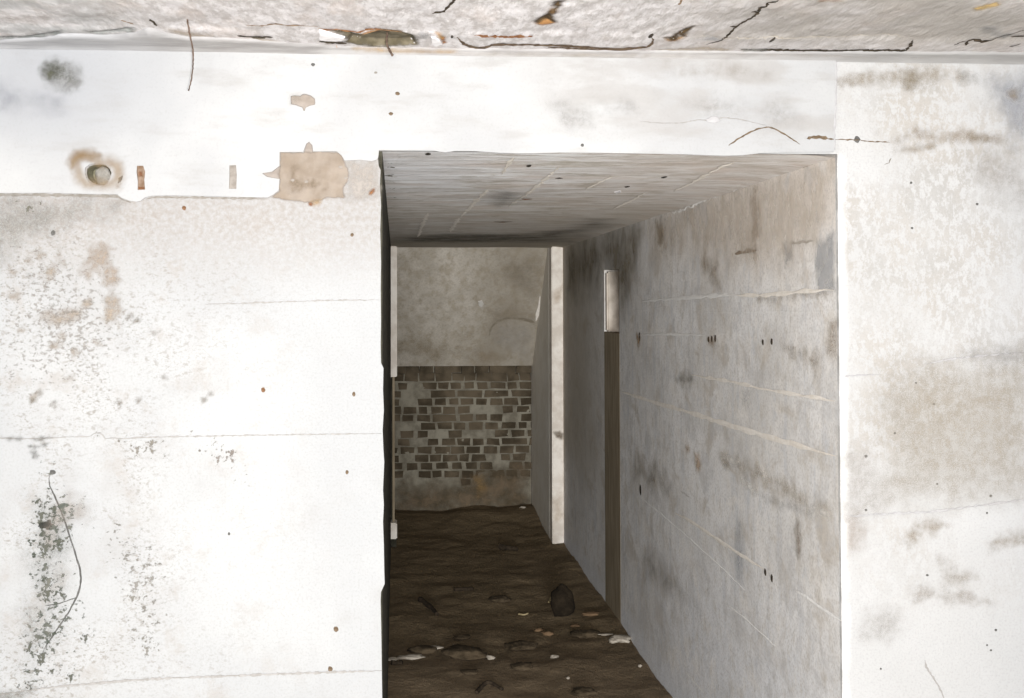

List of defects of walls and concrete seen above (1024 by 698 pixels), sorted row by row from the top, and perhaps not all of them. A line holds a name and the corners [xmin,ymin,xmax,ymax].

spalling [318,28,418,52]
crack [457,36,654,51]
crack [702,0,913,52]
crack [955,30,1024,47]
peeling [291,95,315,111]
crack [640,117,891,168]
peeling [147,143,374,210]
damp [897,377,1020,489]
damp [16,488,94,690]
crack [42,476,82,654]